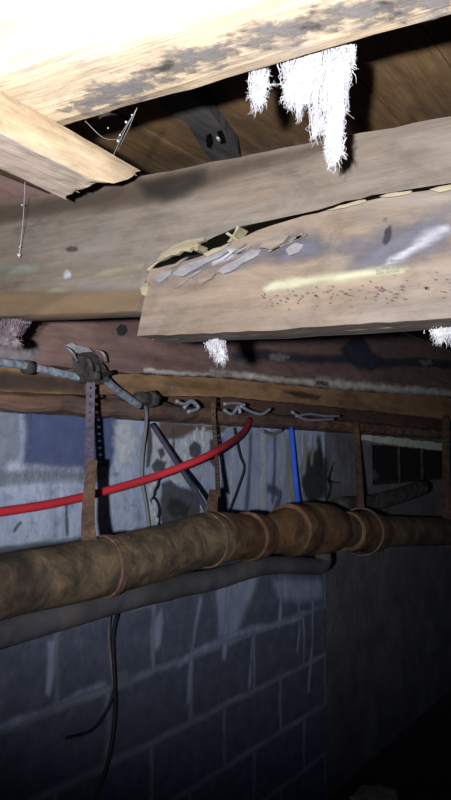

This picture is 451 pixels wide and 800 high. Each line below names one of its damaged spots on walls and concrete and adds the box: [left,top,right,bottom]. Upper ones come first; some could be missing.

crack [173,242,228,264]